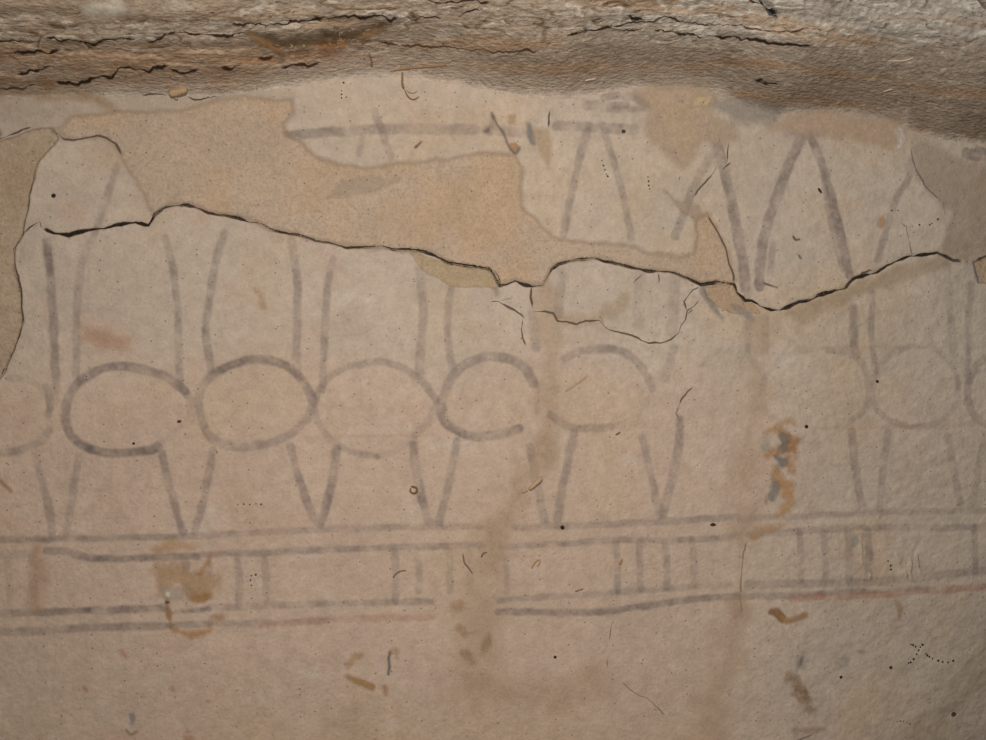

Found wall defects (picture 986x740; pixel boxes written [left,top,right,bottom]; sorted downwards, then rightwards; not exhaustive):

crack [0,0,536,100]
crack [569,15,820,47]
crack [679,145,730,195]
crack [911,151,944,205]
flaking render [0,96,759,378]
crack [2,176,986,374]